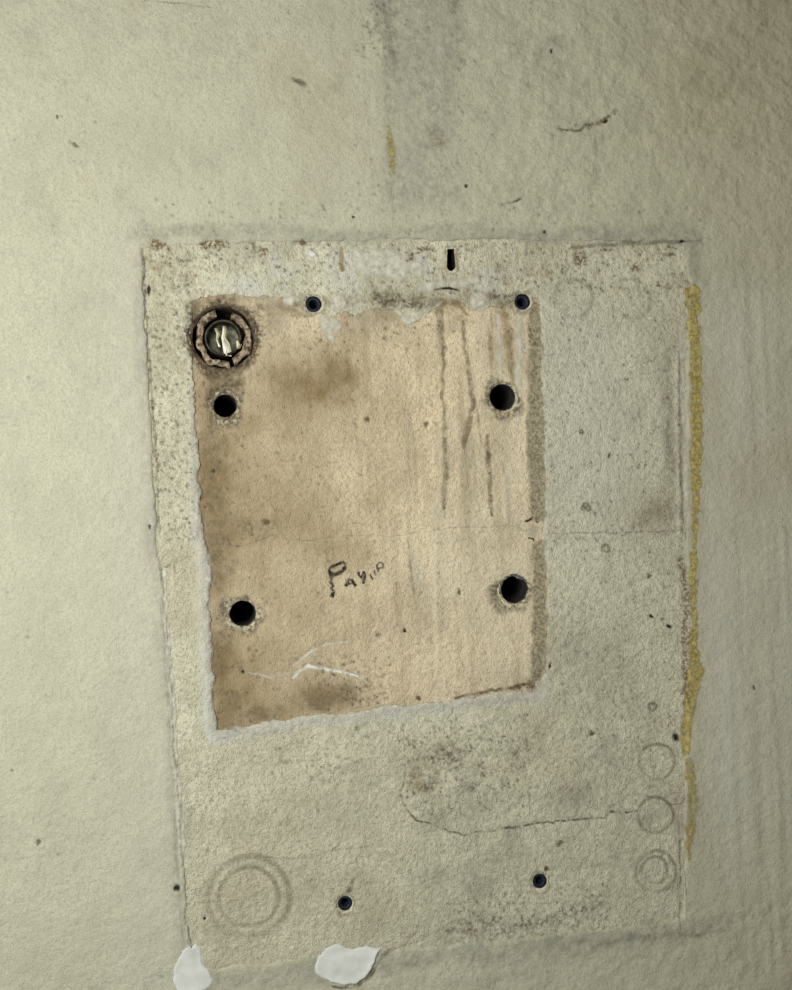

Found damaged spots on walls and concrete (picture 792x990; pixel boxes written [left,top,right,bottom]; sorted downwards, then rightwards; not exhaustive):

water stain [439,298,447,452]
water stain [462,320,475,449]
water stain [497,302,522,423]
peeling [142,231,690,990]